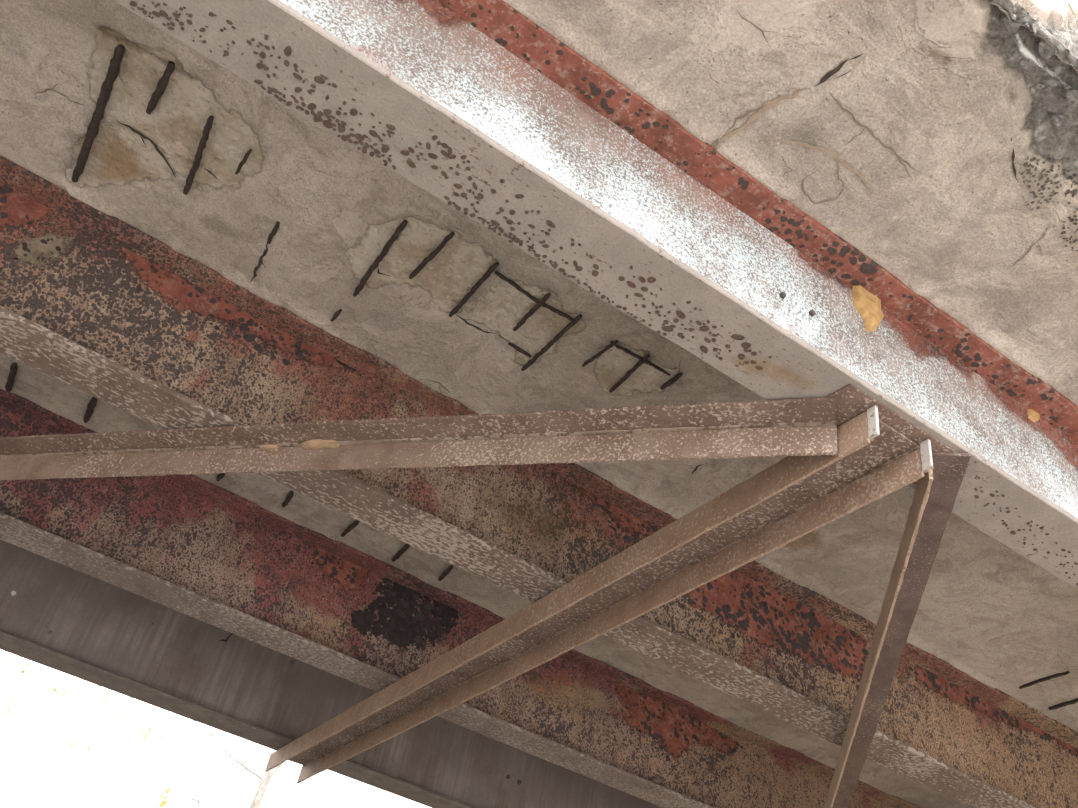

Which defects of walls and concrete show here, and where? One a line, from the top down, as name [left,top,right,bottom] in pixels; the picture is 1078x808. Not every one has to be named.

spalling [65,28,262,195]
rust [130,1,772,370]
spalling [987,0,1078,181]
leakage [1016,35,1050,73]
mould [1020,157,1078,251]
spalling [347,217,585,371]
spalling [582,340,683,396]
rust [974,476,1078,586]